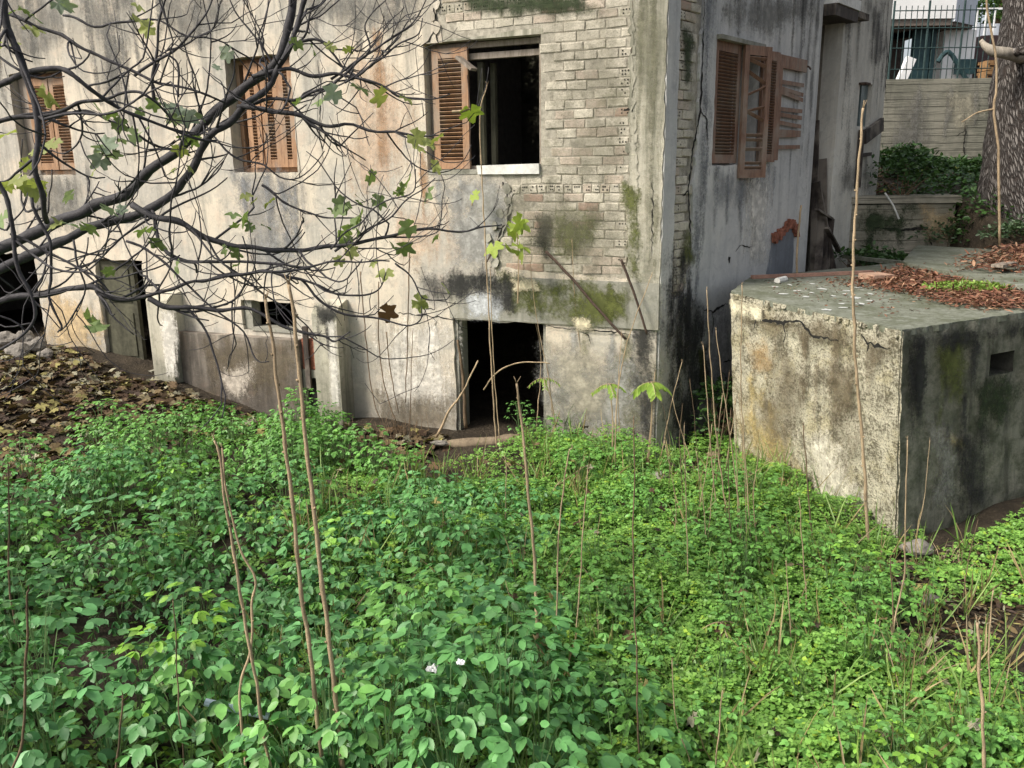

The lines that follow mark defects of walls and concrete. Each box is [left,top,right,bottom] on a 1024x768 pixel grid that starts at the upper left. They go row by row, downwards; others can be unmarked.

crack [683,2,708,268]
leakage [533,214,553,258]
spalling [766,219,800,274]
leakage [424,268,517,318]
leakage [663,224,709,441]
crack [704,303,890,351]
leakage [908,323,1024,520]